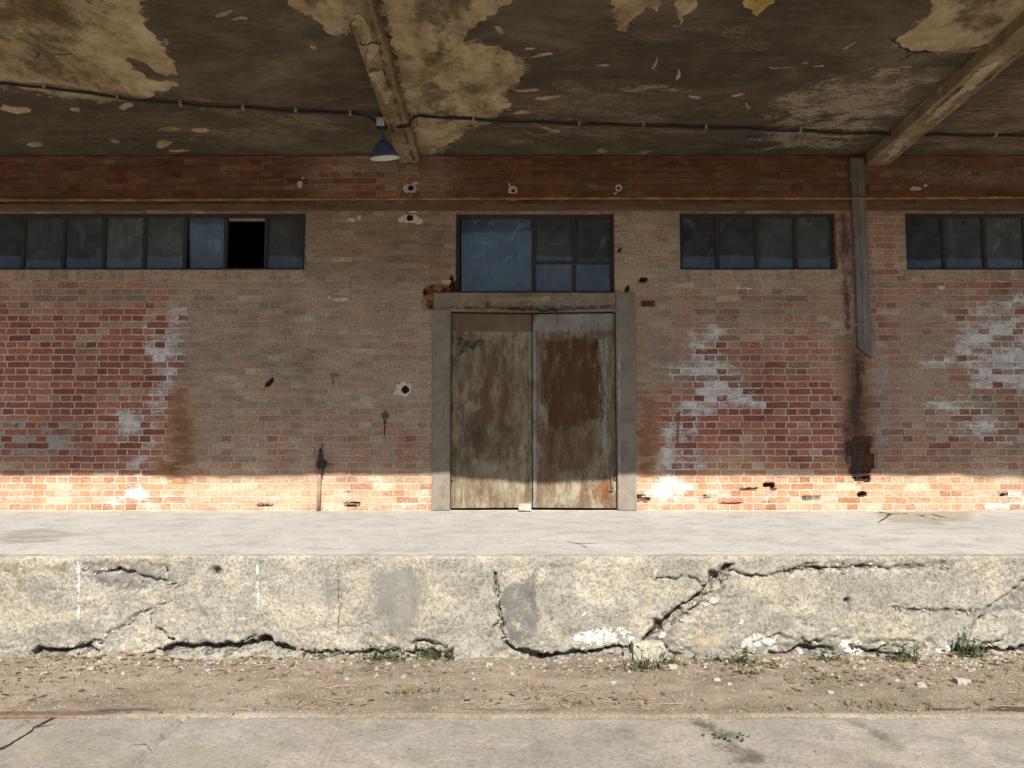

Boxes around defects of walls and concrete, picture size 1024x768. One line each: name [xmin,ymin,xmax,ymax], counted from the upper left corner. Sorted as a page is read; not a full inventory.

peeling [0,0,179,112]
peeling [287,0,563,156]
peeling [610,0,698,32]
peeling [891,0,1024,55]
leakage [0,308,358,508]
corrosion [466,355,517,462]
corrosion [541,336,603,443]
leakage [640,324,767,506]
leakage [918,293,1024,445]
crack [36,565,451,657]
crack [490,561,934,661]
crack [880,601,1024,655]